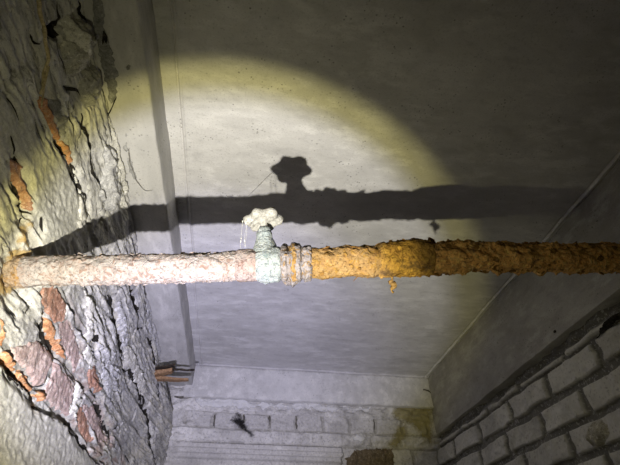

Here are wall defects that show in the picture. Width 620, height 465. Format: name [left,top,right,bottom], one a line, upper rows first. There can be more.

spalling [10,159,33,223]
spalling [37,96,87,230]
spalling [92,0,129,214]
spalling [0,277,148,443]
damp [390,408,432,446]